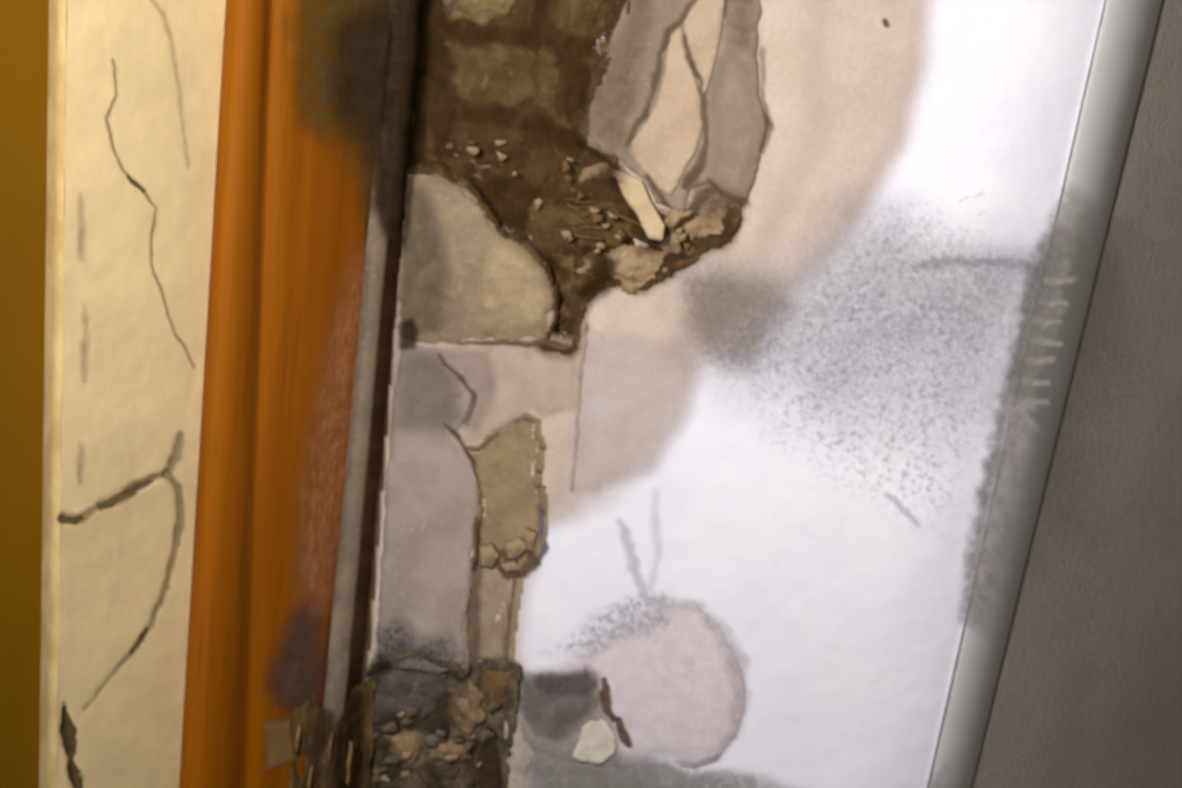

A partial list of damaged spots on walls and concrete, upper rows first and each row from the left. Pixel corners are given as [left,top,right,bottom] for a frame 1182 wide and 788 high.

crack [105,59,195,368]
leakage [299,0,437,237]
hole [398,320,416,348]
spalling [408,0,771,490]
leakage [385,0,1077,619]
crack [57,433,183,709]
spalling [463,412,548,579]
spalling [365,649,521,788]
leakage [519,670,756,788]